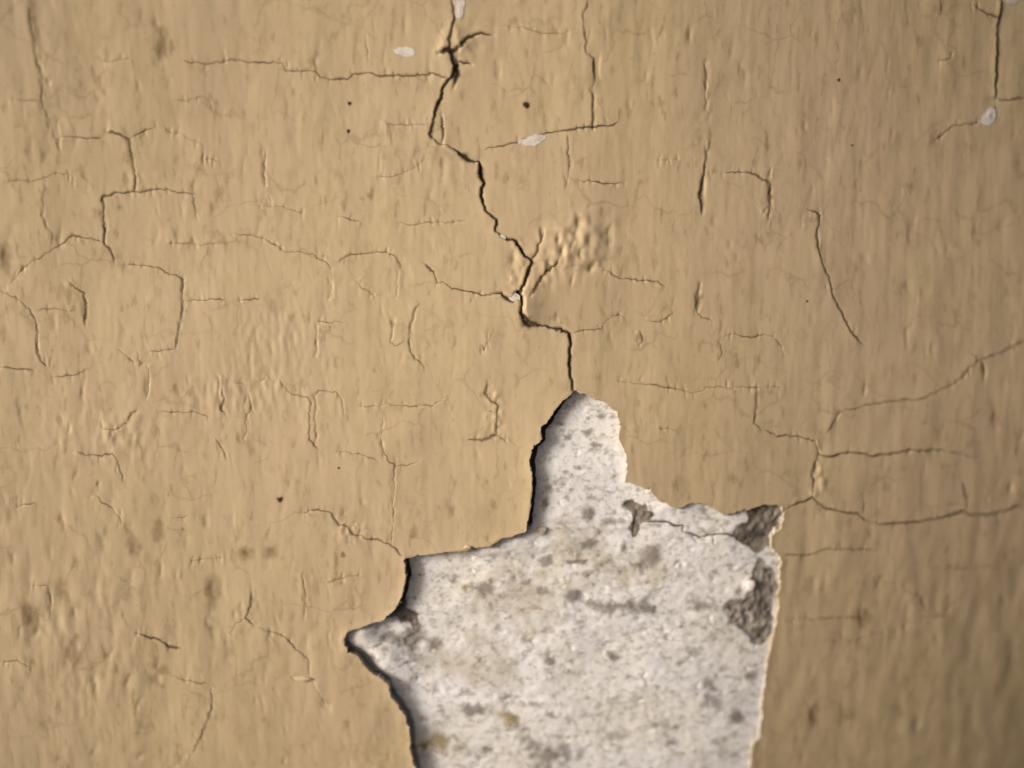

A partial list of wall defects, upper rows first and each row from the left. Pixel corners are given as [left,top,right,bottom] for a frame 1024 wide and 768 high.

crack [978,3,1018,101]
crack [20,128,196,272]
crack [188,5,615,393]
crack [75,288,88,320]
crack [472,387,498,441]
crack [313,432,398,551]
peeling [344,390,785,768]
crack [645,521,733,541]
crack [754,416,1023,525]
crack [142,634,176,648]